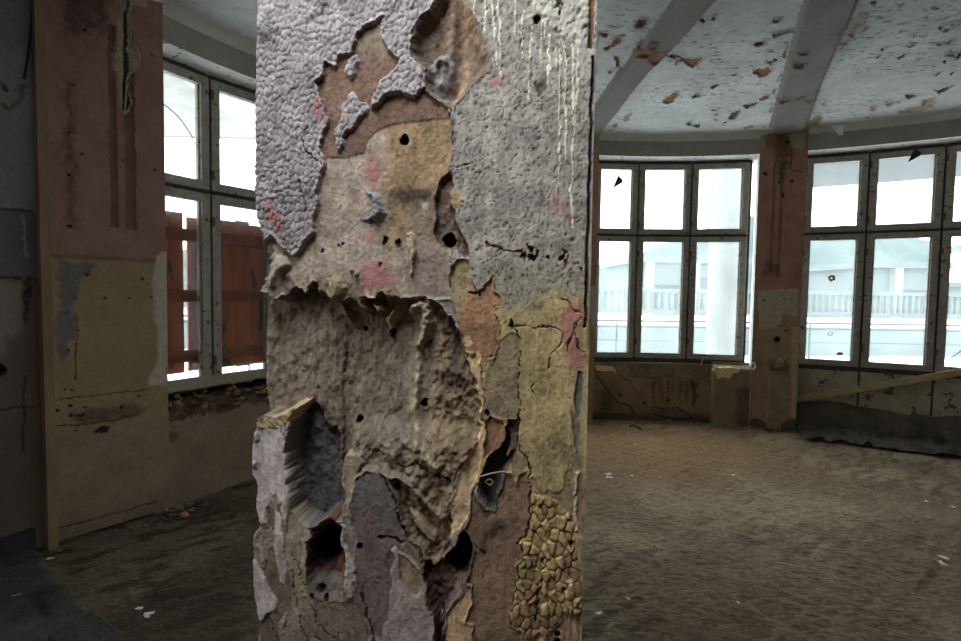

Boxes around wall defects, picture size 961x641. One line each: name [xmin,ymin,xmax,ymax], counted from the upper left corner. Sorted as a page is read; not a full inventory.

peeling [632,43,703,69]
peeling [662,92,679,104]
peeling [712,19,846,136]
peeling [865,23,961,119]
spalling [252,0,583,641]
crack [468,291,585,627]